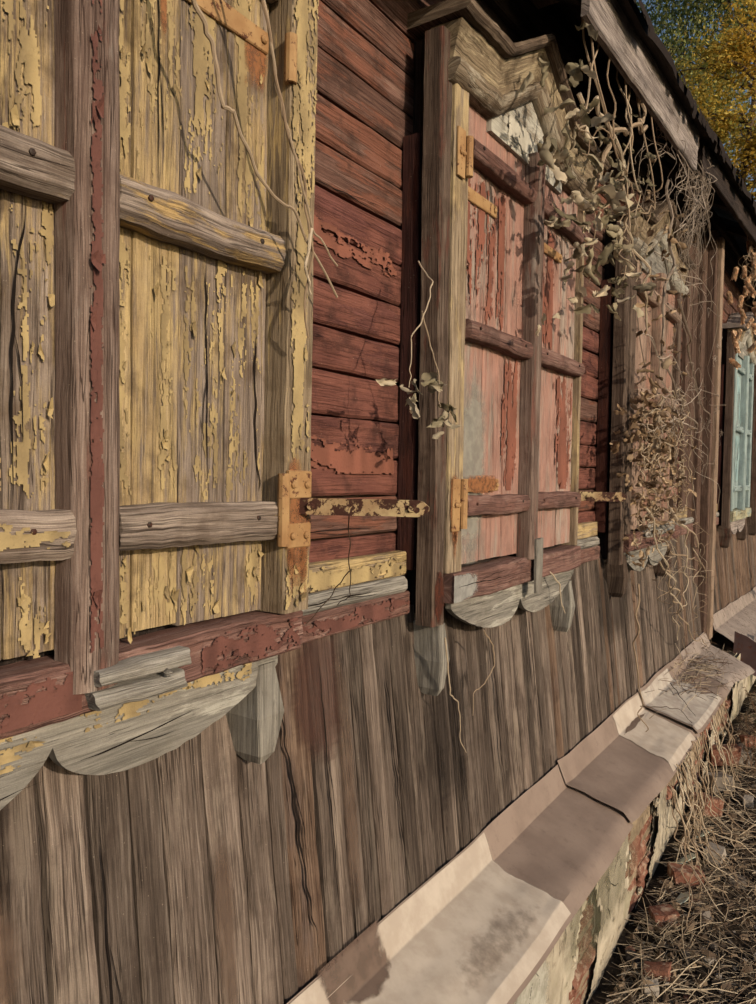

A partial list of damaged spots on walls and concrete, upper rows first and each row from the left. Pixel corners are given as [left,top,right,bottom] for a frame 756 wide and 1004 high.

peeling [119,0,224,194]
corrosion [245,42,267,87]
peeling [291,0,397,474]
peeling [0,201,55,499]
peeling [149,250,264,500]
peeling [0,524,71,551]
corrosion [288,547,308,589]
corrosion [290,498,311,524]
corrosion [468,475,497,493]
peeling [0,540,410,775]
leakage [290,833,571,1004]
flaking render [569,894,600,1004]